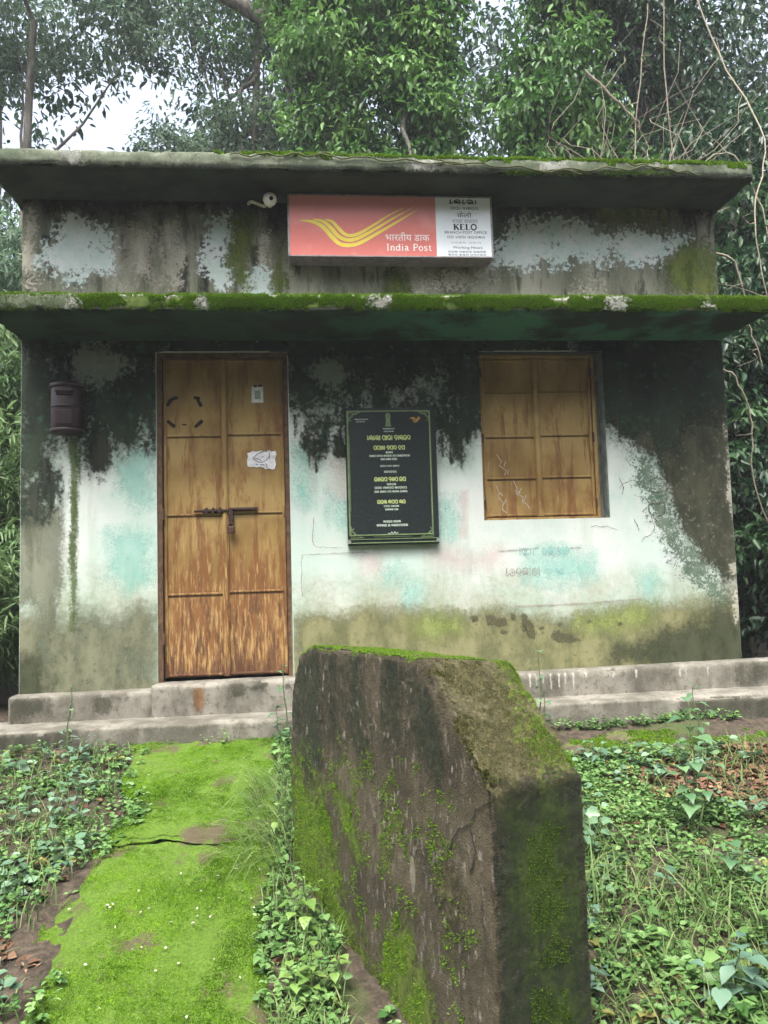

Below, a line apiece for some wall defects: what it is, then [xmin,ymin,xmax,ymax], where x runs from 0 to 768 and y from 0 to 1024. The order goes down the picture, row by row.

water stain [175,253,188,293]
water stain [200,236,209,293]
water stain [250,245,260,270]
water stain [0,340,737,754]
water stain [286,593,768,789]
crack [447,803,490,874]